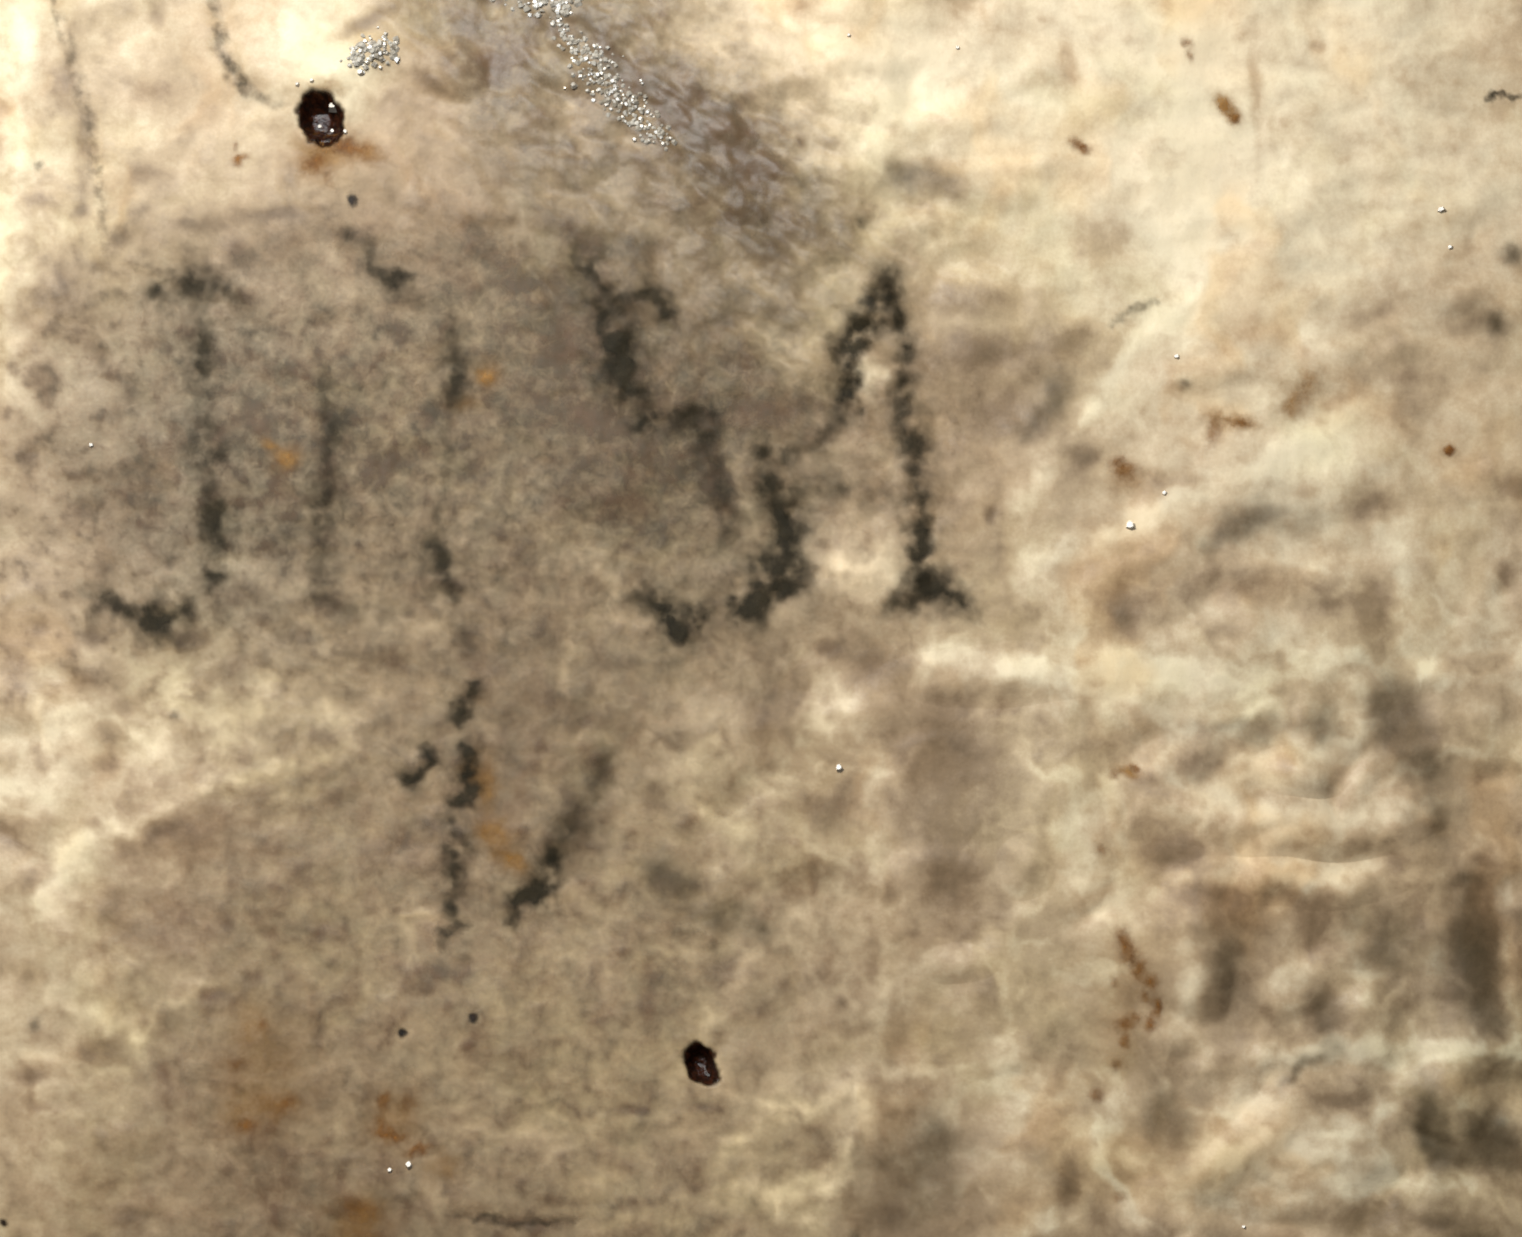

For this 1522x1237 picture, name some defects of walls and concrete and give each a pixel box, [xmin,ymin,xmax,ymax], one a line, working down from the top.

water stain [441,0,849,280]
water stain [154,689,745,1237]
corrosion [1118,935,1161,1045]